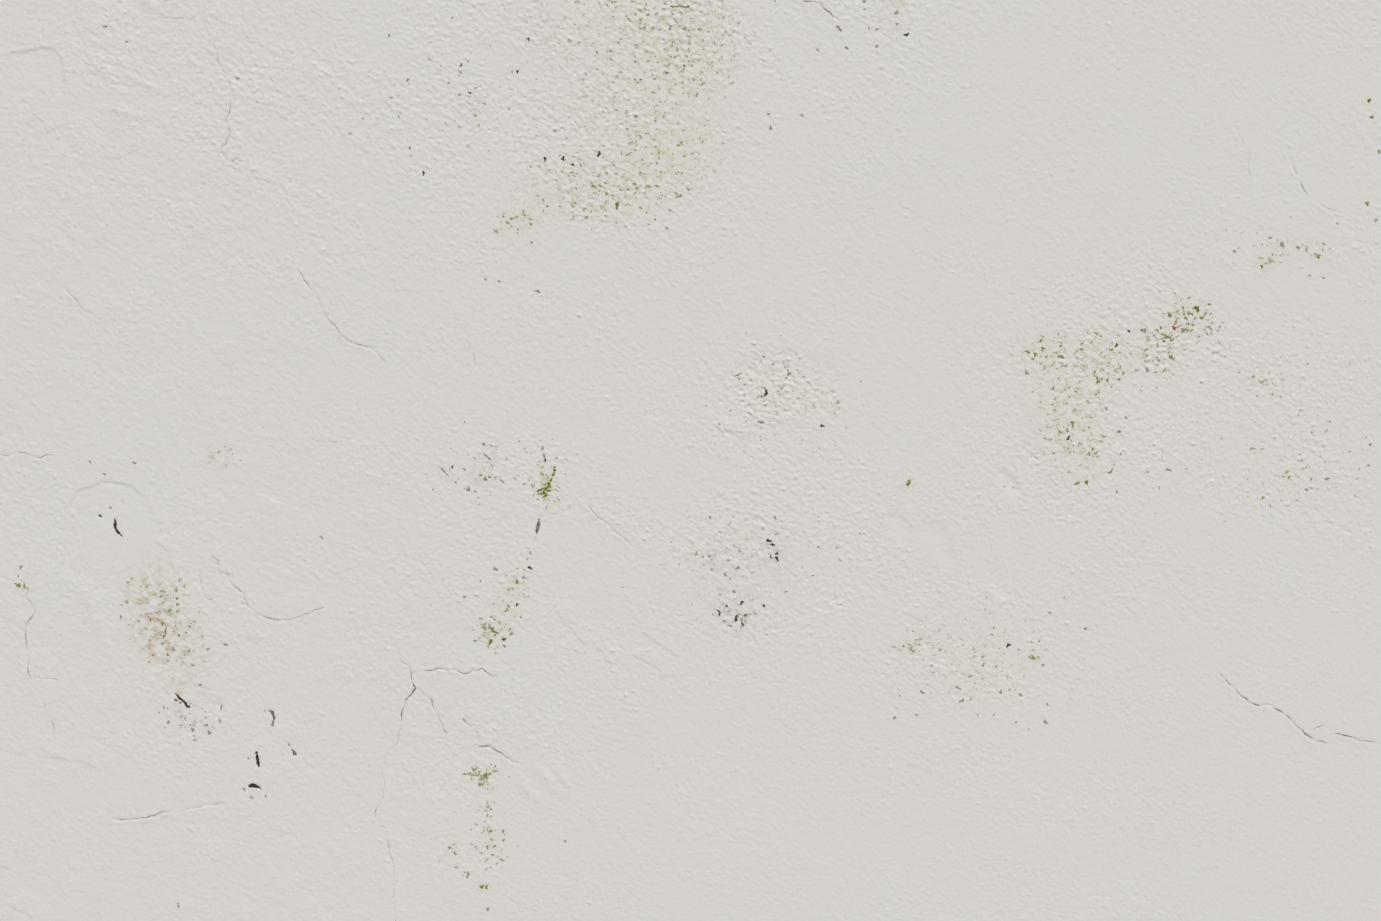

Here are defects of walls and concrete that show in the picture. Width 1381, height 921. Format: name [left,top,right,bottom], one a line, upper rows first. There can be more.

water stain [488,0,776,244]
water stain [1009,287,1381,516]
crack [375,668,517,921]
water stain [439,764,519,911]
water stain [472,551,541,654]
crack [1220,674,1372,743]